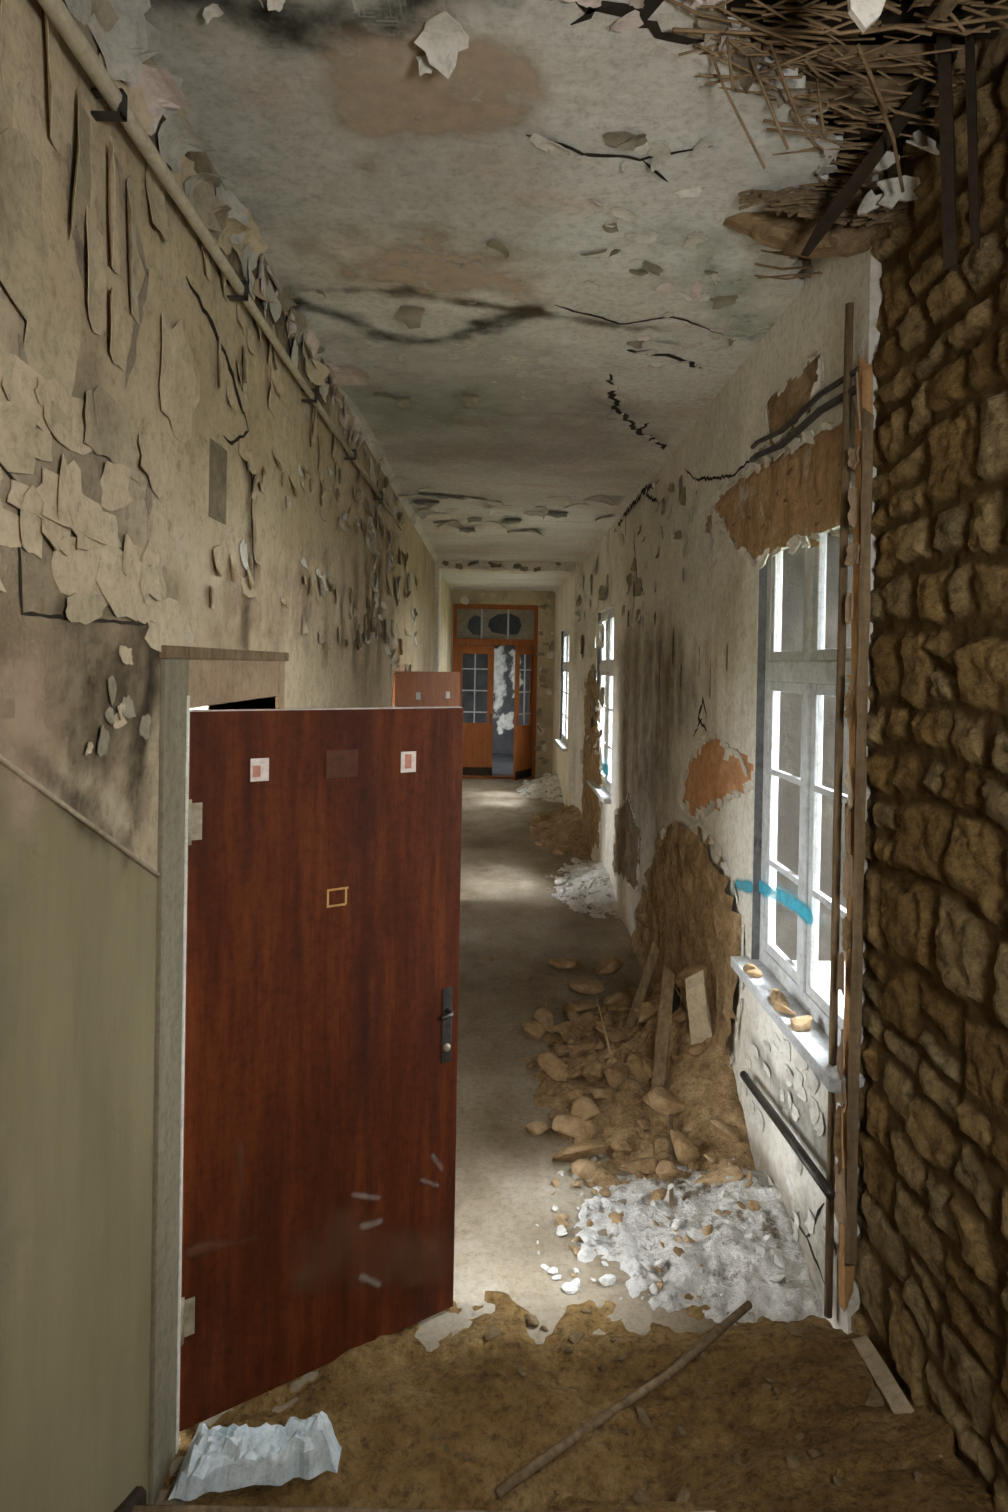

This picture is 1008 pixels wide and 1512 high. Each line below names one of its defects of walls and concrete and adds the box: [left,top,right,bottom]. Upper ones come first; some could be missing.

leakage [220,0,428,43]
peeling [847,0,886,33]
peeling [0,0,861,1257]